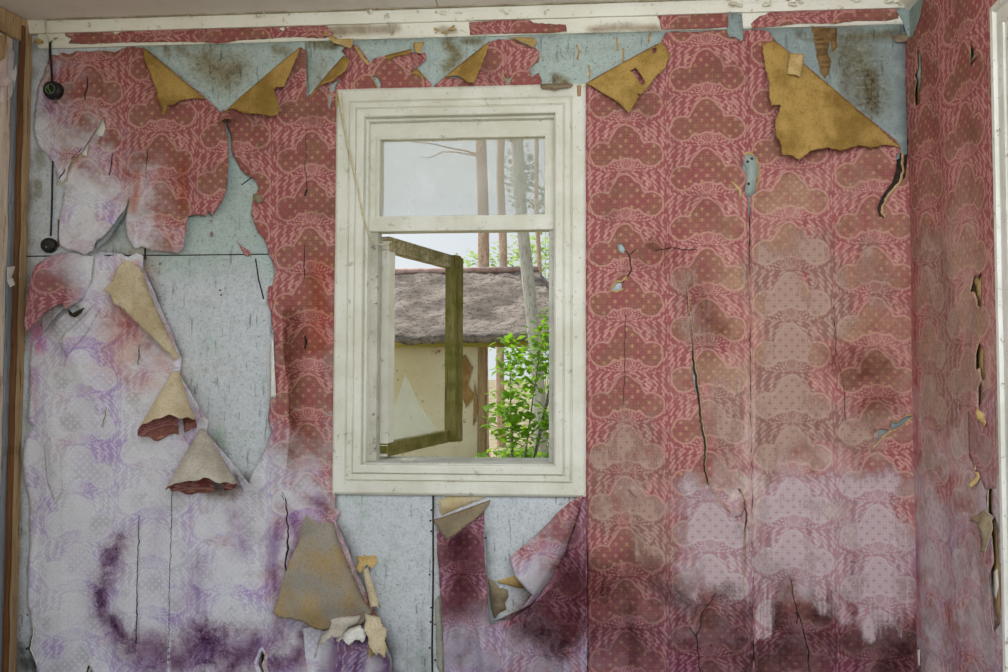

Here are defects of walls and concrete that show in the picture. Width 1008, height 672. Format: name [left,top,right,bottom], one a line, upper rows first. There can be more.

peeling [137,10,490,126]
peeling [509,31,670,113]
peeling [763,0,921,217]
crack [621,247,697,283]
peeling [7,37,276,672]
peeling [971,273,987,427]
crack [281,492,289,572]
peeling [273,494,584,672]
crack [685,287,755,672]
water stain [588,233,914,643]
crack [790,578,810,672]
peeling [969,489,1000,631]